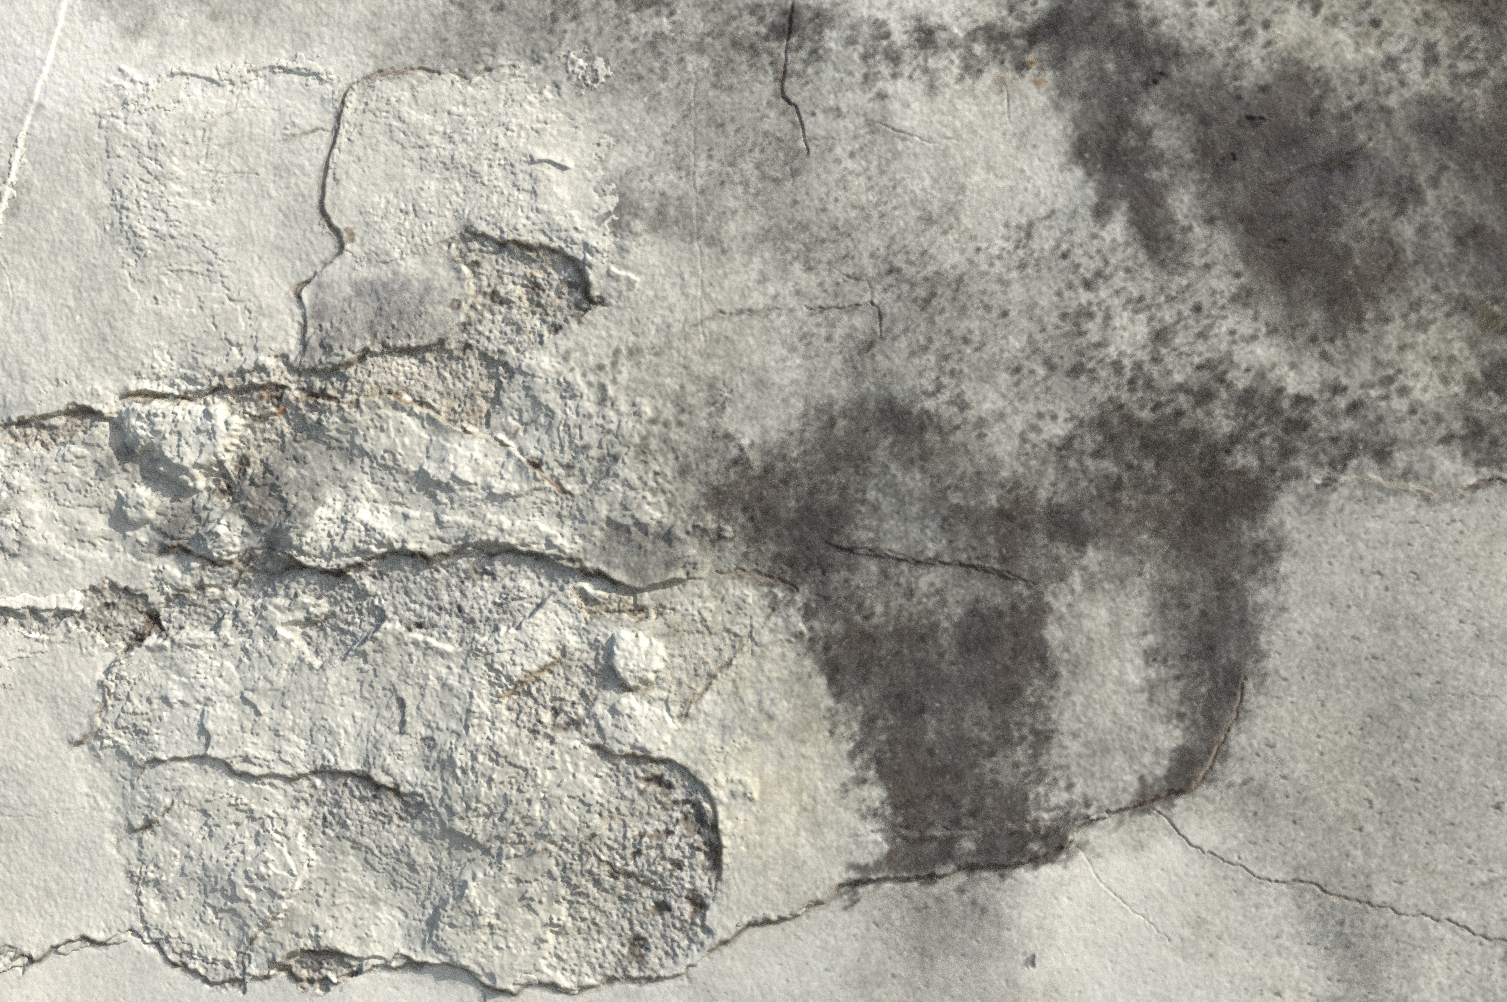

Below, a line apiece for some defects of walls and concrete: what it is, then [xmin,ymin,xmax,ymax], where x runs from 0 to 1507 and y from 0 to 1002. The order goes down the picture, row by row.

leakage [736,4,830,64]
peeling [142,46,619,512]
leakage [607,194,626,227]
leakage [865,0,1507,467]
crack [302,342,366,403]
spalling [0,542,745,724]
leakage [689,246,1392,910]
crack [0,930,133,972]
peeling [128,762,424,997]
crack [244,950,412,985]
spalling [562,751,726,977]
crack [710,903,814,952]